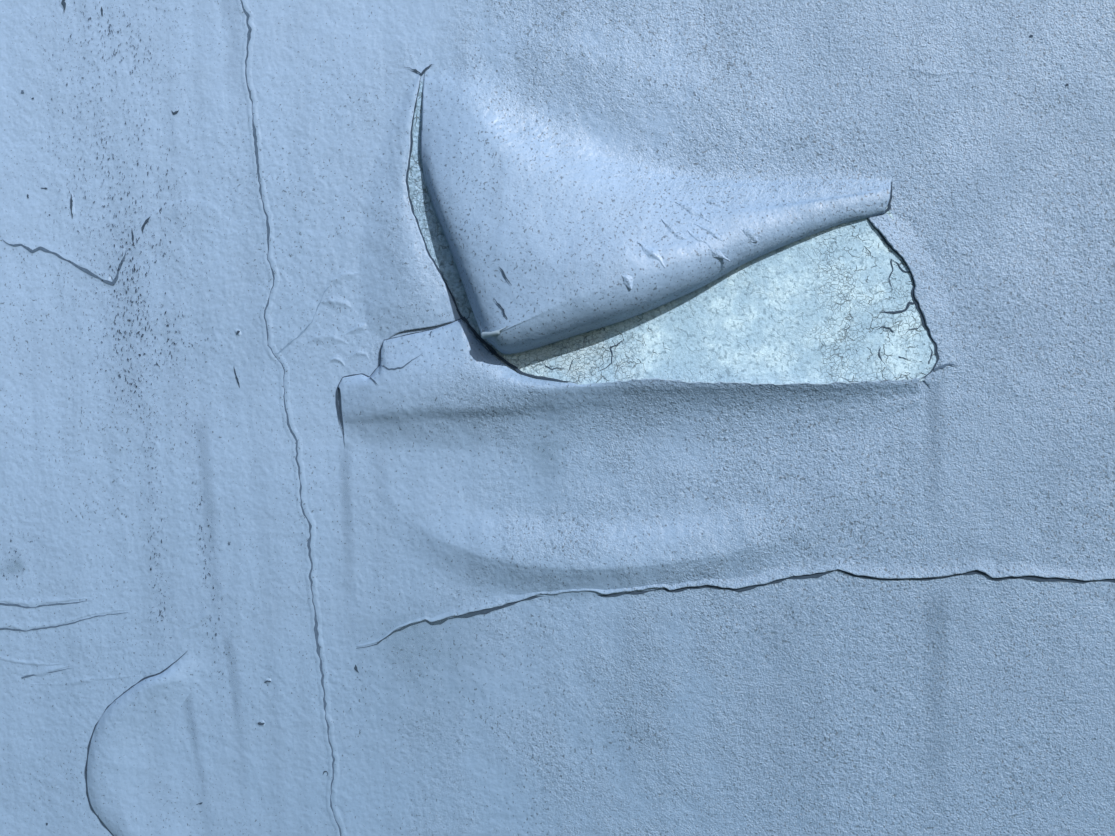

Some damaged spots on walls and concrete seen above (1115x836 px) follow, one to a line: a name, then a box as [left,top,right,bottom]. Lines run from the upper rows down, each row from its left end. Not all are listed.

crack [2,217,150,288]
crack [235,0,347,836]
peeling [358,0,969,389]
crack [356,556,1115,649]